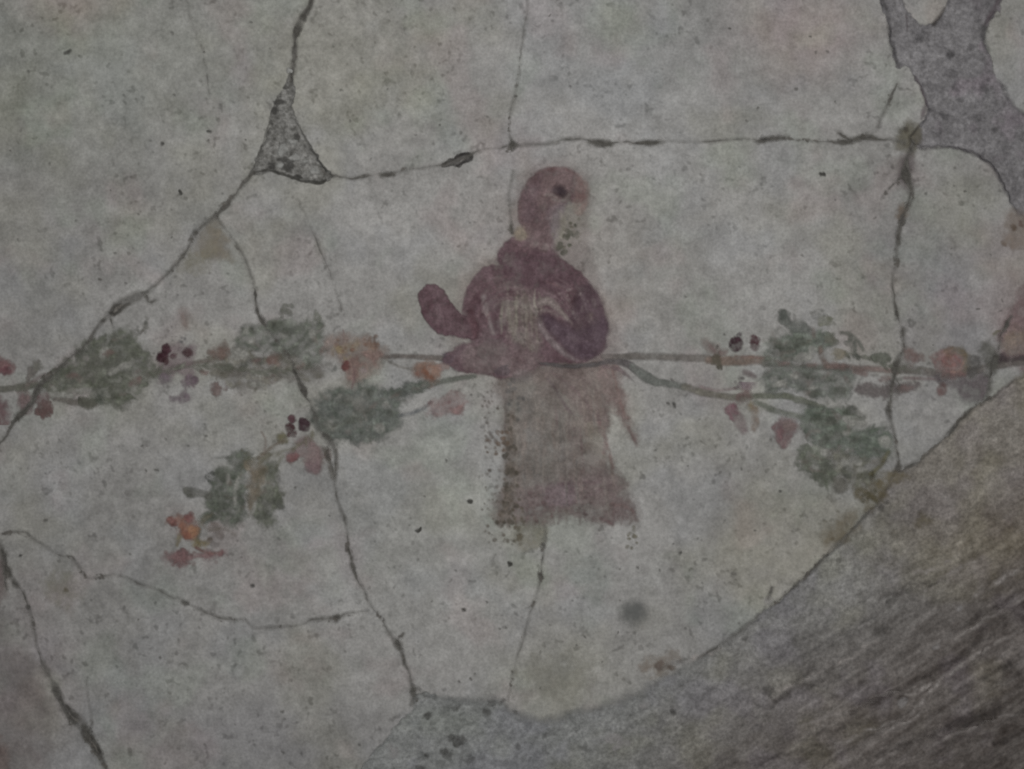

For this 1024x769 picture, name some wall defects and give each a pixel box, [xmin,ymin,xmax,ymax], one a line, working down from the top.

crack [290,0,313,82]
flaking render [250,68,333,184]
crack [322,152,475,180]
crack [565,138,661,146]
flaking render [880,0,1024,217]
crack [0,171,255,443]
crack [759,133,915,469]
crack [948,317,1011,435]
crack [254,290,417,702]
crack [0,531,43,663]
flaking render [362,374,1024,769]
crack [53,688,107,769]